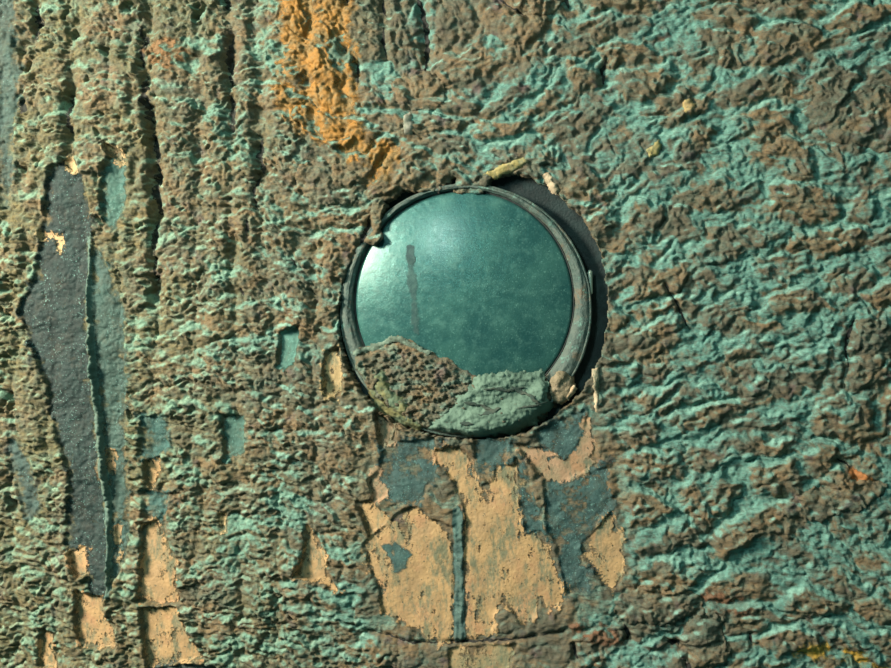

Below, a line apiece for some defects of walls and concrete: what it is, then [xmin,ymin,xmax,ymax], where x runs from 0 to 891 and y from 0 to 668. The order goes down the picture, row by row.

crack [417,0,430,71]
crack [225,39,236,135]
crack [137,24,164,281]
crack [245,139,266,241]
spalling [15,142,215,668]
spalling [4,435,41,520]
peeling [291,525,345,596]
peeling [360,367,627,668]